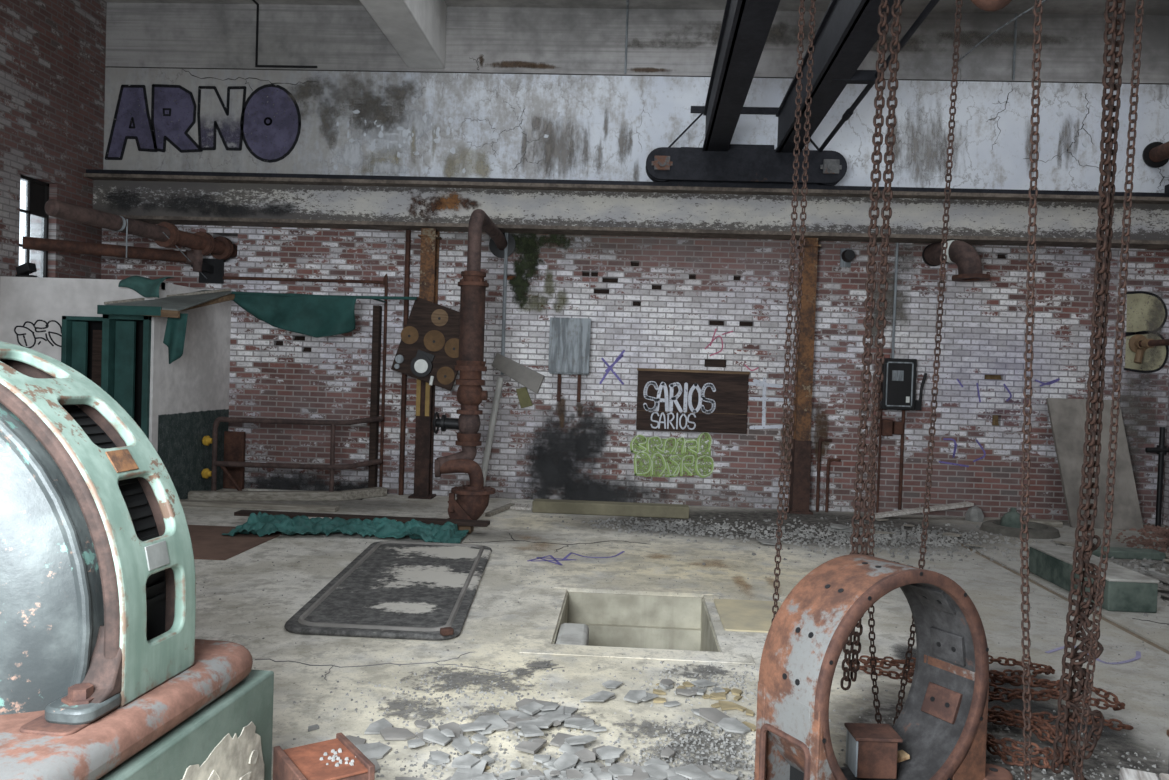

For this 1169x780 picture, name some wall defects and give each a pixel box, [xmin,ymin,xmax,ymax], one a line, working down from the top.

leakage [290,81,430,174]
leakage [522,112,632,175]
leakage [888,117,955,175]
leakage [1058,123,1078,160]
corrosion [409,192,478,221]